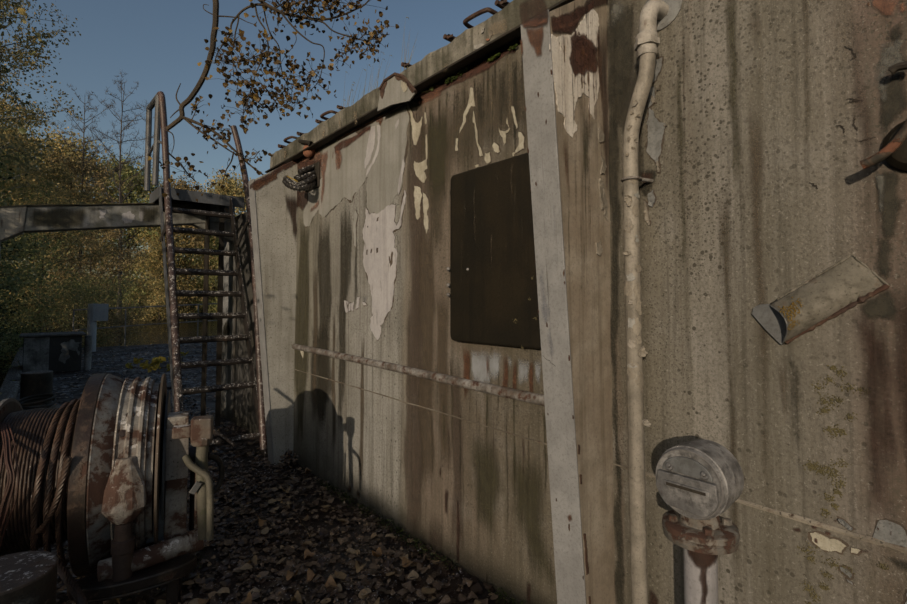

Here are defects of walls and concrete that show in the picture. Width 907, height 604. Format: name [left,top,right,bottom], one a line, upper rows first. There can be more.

peeling [455,87,529,168]
rust [380,0,608,176]
peeling [549,9,604,143]
peeling [625,56,667,174]
water stain [728,7,736,137]
water stain [877,25,907,129]
peeling [303,102,429,341]
water stain [876,172,901,276]
water stain [294,217,357,440]
water stain [419,239,461,470]
water stain [476,418,551,573]
peeling [808,531,863,586]